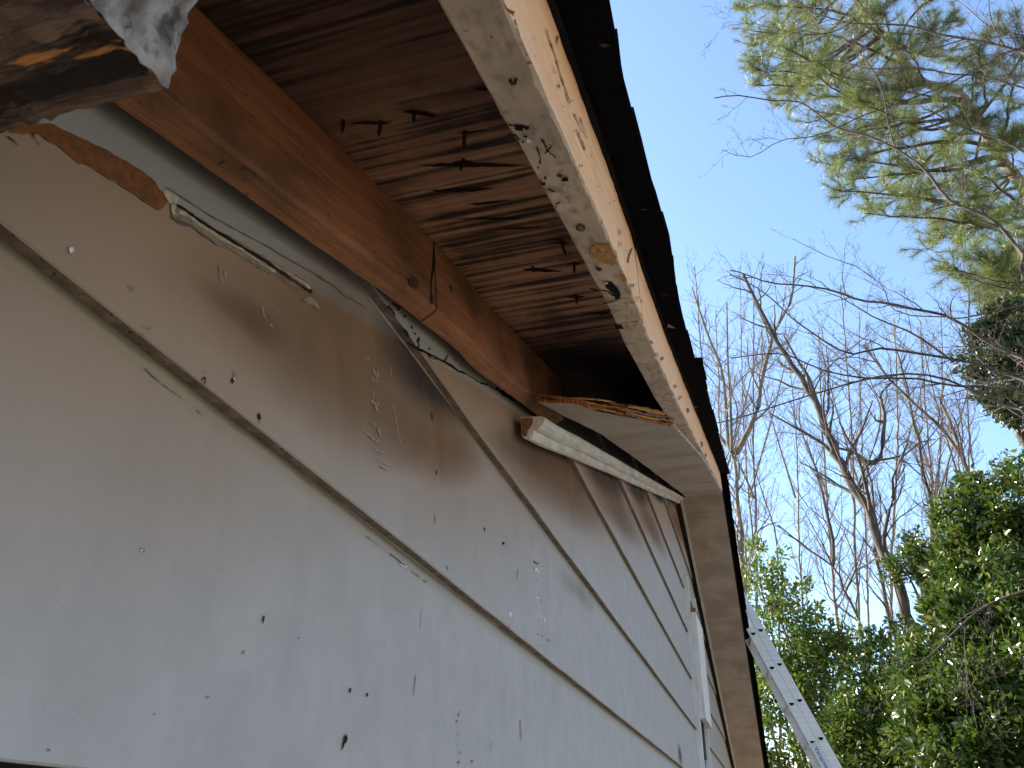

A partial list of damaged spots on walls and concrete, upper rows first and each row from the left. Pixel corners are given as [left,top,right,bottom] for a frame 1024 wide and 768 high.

peeling [8,123,179,216]
crack [427,244,435,307]